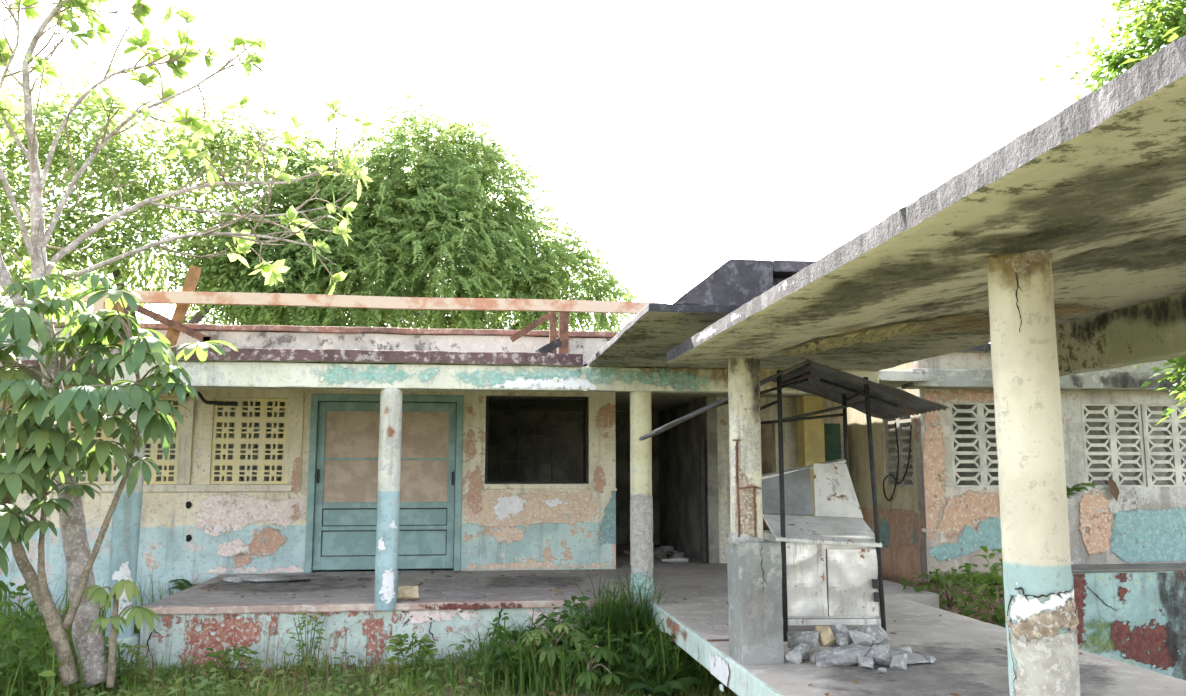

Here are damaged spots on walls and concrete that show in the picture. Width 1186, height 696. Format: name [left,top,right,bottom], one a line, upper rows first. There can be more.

leakage [643,161,1186,412]
crack [1014,272,1022,332]
peeling [492,376,598,391]
peeling [184,457,306,574]
peeling [461,558,611,570]
peeling [463,429,618,544]
peeling [630,494,653,573]
peeling [912,390,1000,543]
peeling [1079,486,1141,557]
peeling [1116,573,1128,604]
peeling [1005,573,1088,696]
peeling [1110,604,1182,670]